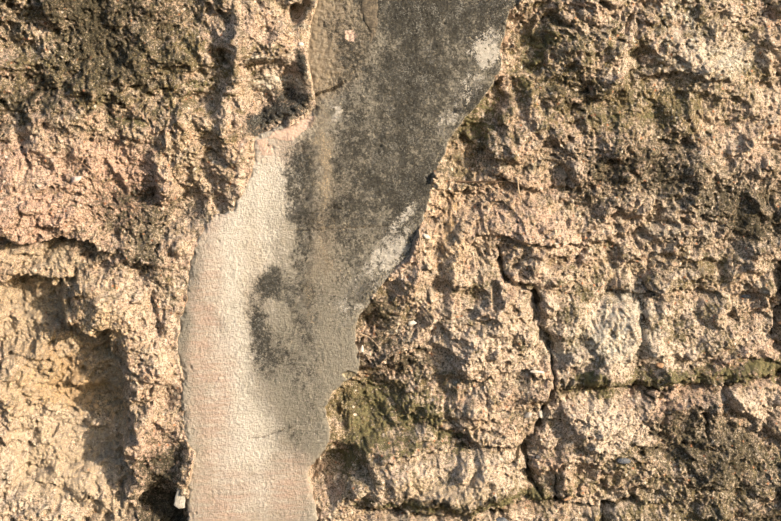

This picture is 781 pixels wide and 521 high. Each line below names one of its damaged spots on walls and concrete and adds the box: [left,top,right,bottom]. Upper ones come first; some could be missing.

water stain [244,0,517,390]
crack [497,247,510,281]
crack [529,288,541,304]
crack [769,260,781,334]
crack [633,293,646,335]
crack [723,371,781,389]
crack [633,384,688,400]
crack [509,340,584,501]
crack [366,507,419,517]
crack [489,501,519,513]
crack [588,497,626,520]